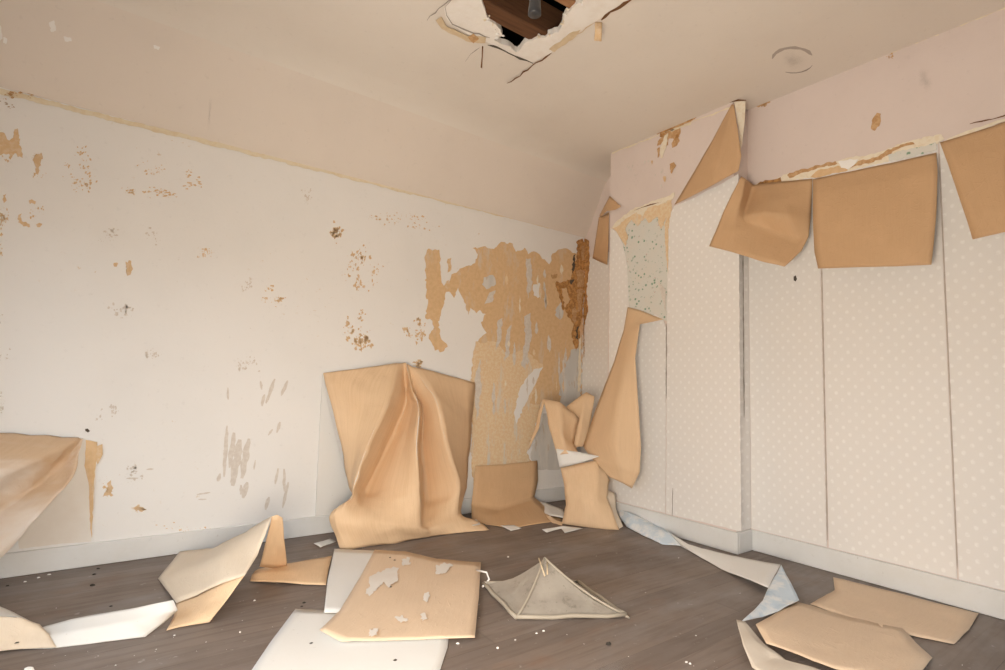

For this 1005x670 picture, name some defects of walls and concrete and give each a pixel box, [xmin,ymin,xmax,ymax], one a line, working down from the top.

spalling [427,0,631,83]
peeling [0,129,43,177]
peeling [651,118,695,182]
peeling [871,113,881,131]
peeling [0,194,44,256]
peeling [402,242,663,488]